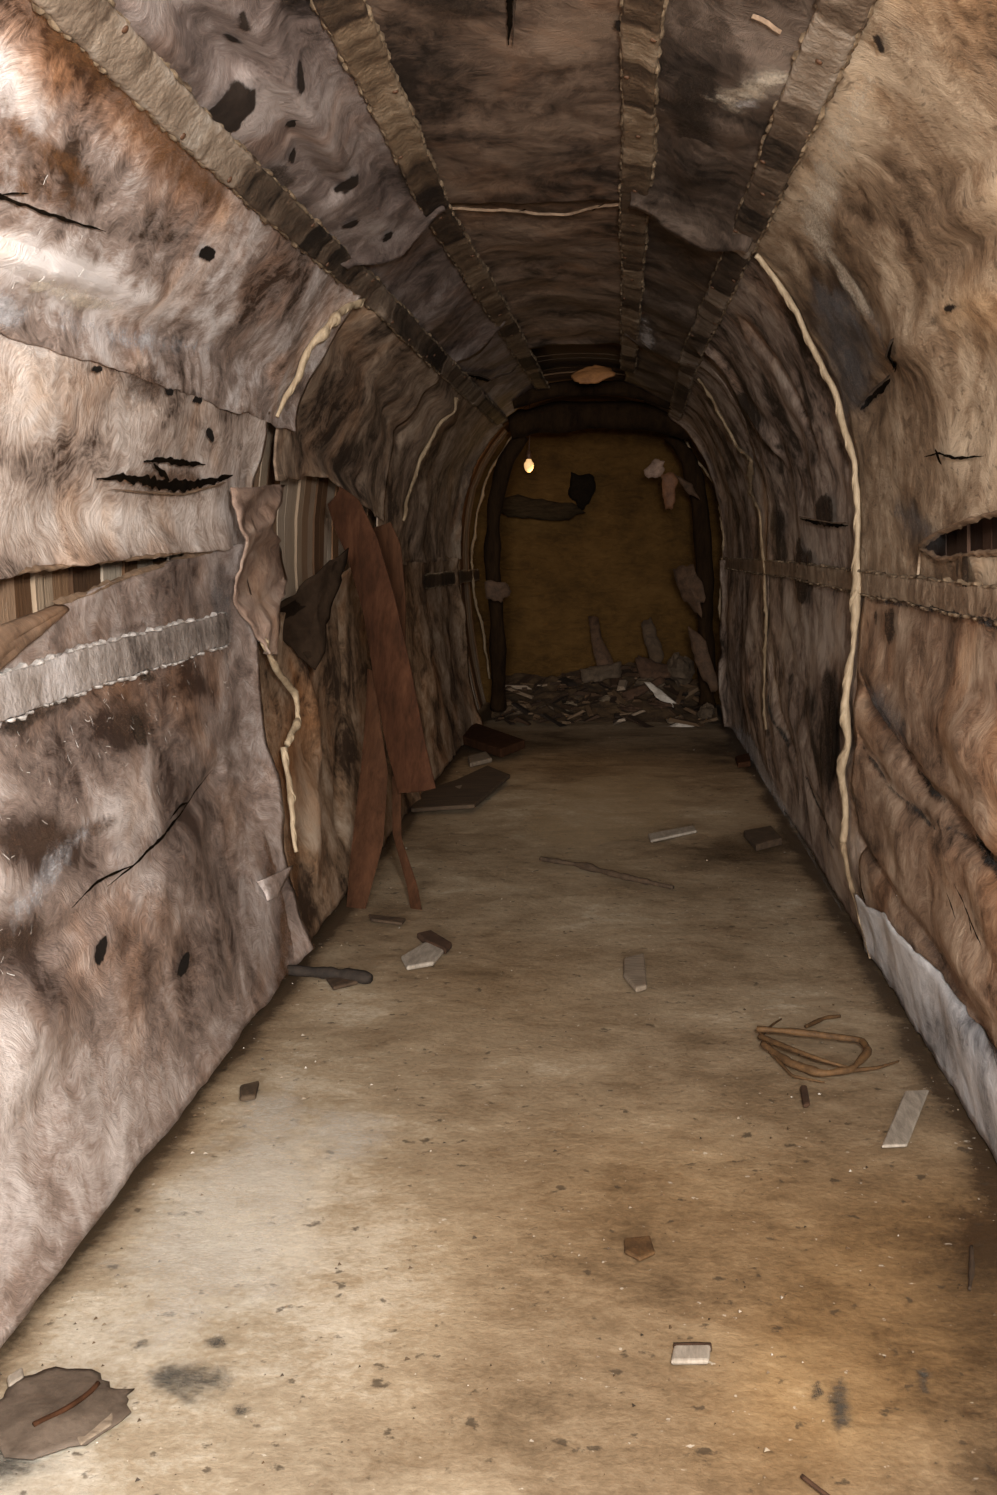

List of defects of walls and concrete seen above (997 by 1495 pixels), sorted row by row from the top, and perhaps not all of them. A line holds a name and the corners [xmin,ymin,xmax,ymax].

crack [0,192,106,232]
peeling [0,604,70,670]
crack [72,774,209,908]